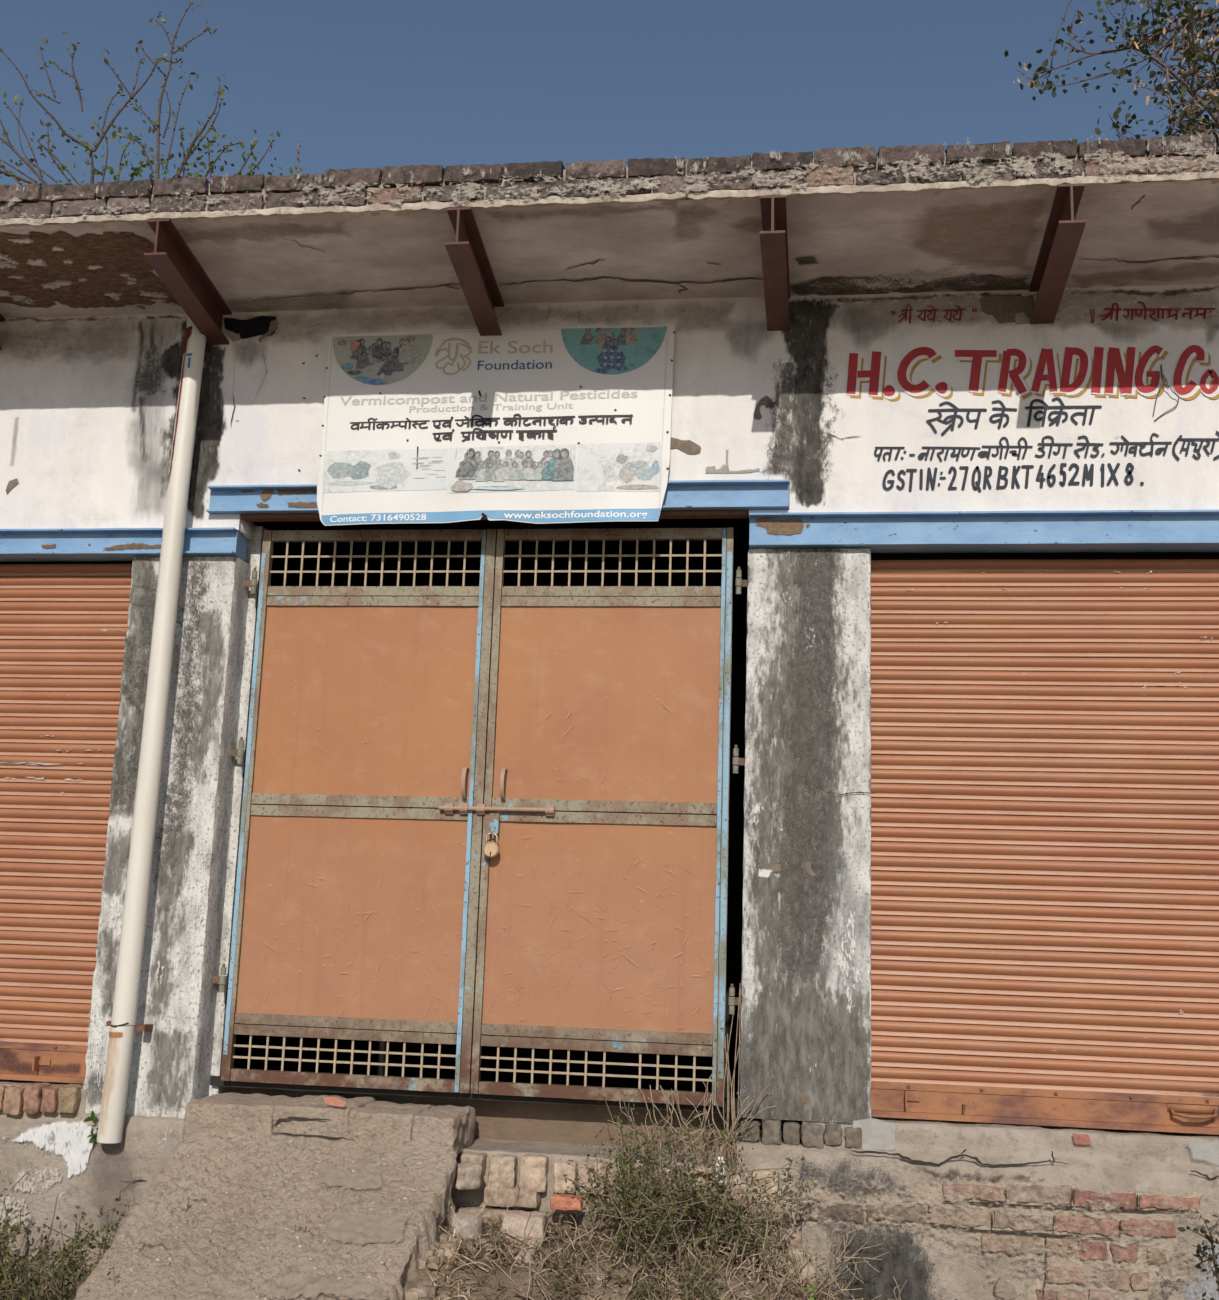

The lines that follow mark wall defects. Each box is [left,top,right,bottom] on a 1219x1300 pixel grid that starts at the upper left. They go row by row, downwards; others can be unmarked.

peeling [0,231,180,309]
water stain [134,318,226,518]
crack [254,284,460,301]
crack [501,259,762,324]
water stain [763,201,1039,506]
water stain [109,556,158,816]
water stain [143,556,224,1109]
water stain [740,548,870,1123]
water stain [97,929,120,1015]
peeling [0,1121,96,1233]
crack [851,1149,1189,1297]
crack [1191,1170,1219,1180]